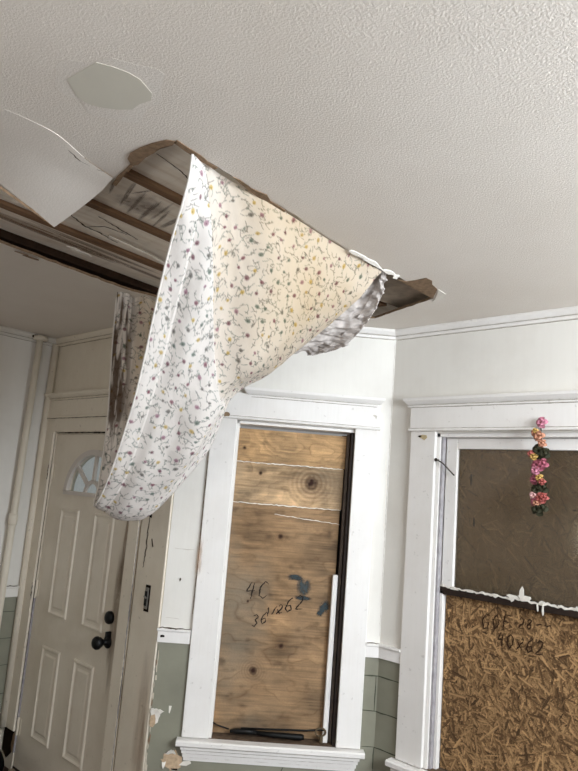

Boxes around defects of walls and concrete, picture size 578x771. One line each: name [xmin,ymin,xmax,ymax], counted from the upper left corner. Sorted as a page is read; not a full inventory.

peeling [113,164,132,186]
water stain [122,187,176,226]
peeling [233,177,285,212]
peeling [399,278,437,299]
peeling [144,650,172,771]
spalling [161,750,191,770]